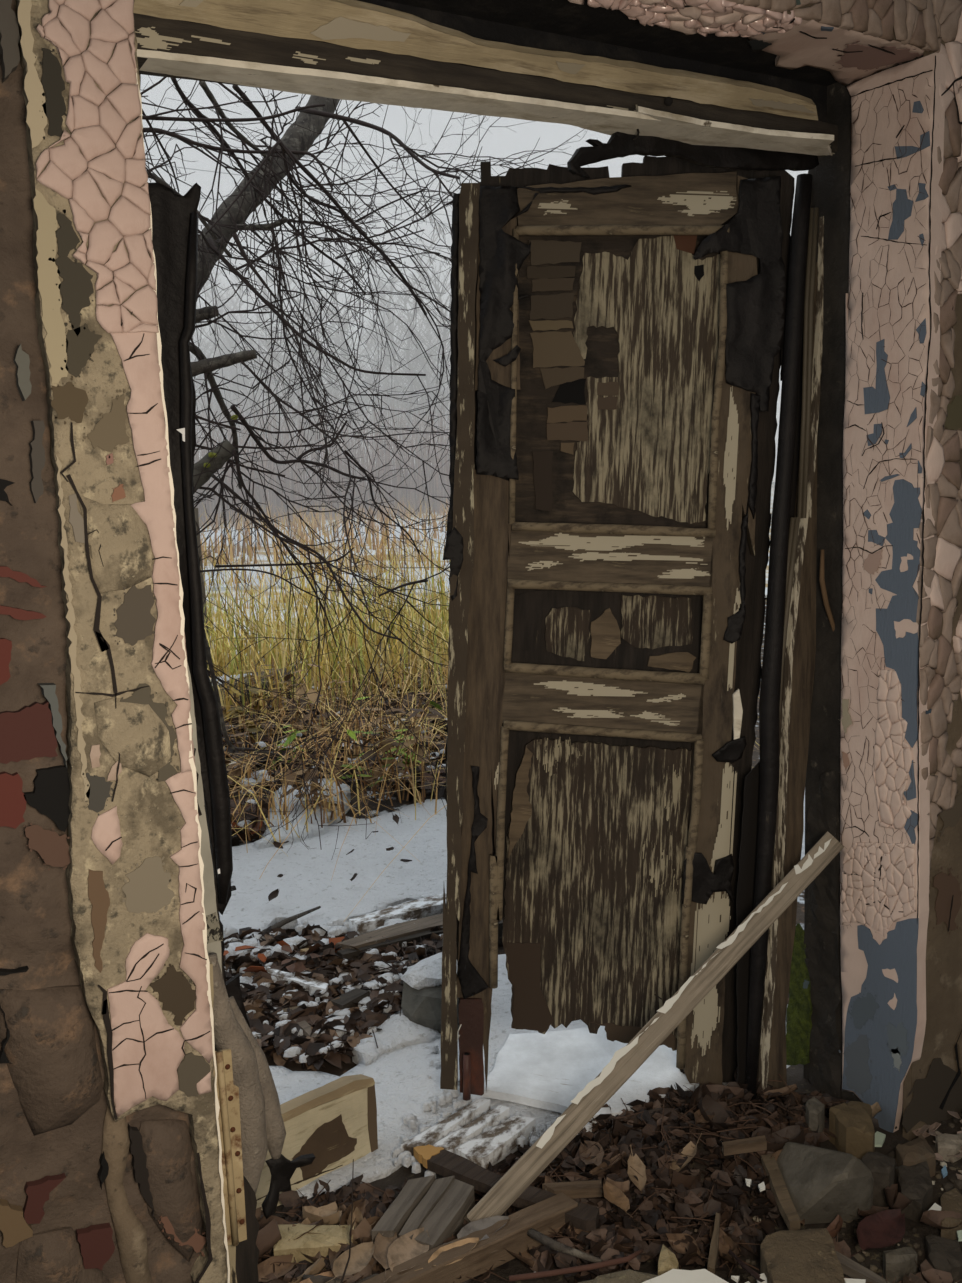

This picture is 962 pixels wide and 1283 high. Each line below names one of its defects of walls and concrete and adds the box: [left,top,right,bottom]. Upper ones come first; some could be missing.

peeling [568,0,802,37]
crack [121,311,150,361]
crack [128,403,158,414]
spalling [0,479,14,506]
crack [773,18,962,926]
peeling [842,0,962,1147]
flaking render [0,701,70,832]
crack [60,422,210,1120]
crack [98,1151,109,1190]
flaking render [23,1173,66,1224]